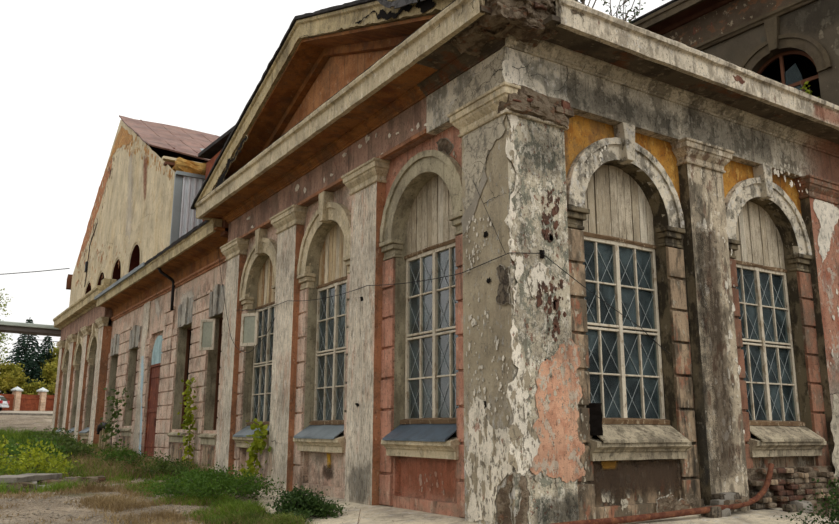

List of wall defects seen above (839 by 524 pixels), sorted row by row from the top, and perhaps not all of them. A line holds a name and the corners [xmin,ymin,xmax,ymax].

flaking render [355,0,436,24]
spalling [446,0,558,116]
crack [475,58,569,99]
flaking render [436,138,454,155]
peeling [462,114,588,524]
leakage [681,233,736,483]
leakage [589,459,694,497]
peeling [601,490,630,512]